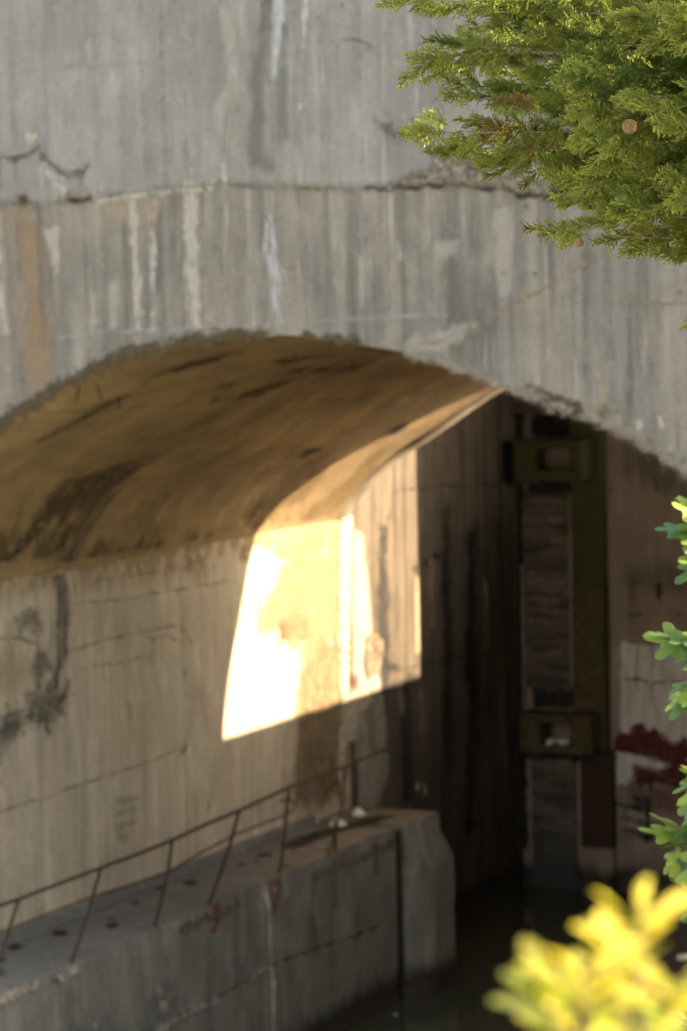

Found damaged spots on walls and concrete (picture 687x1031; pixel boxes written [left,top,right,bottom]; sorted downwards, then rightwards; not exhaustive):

water stain [271,0,285,77]
spalling [382,123,563,196]
crack [71,624,194,756]
water stain [257,532,353,807]
crack [143,913,379,1031]